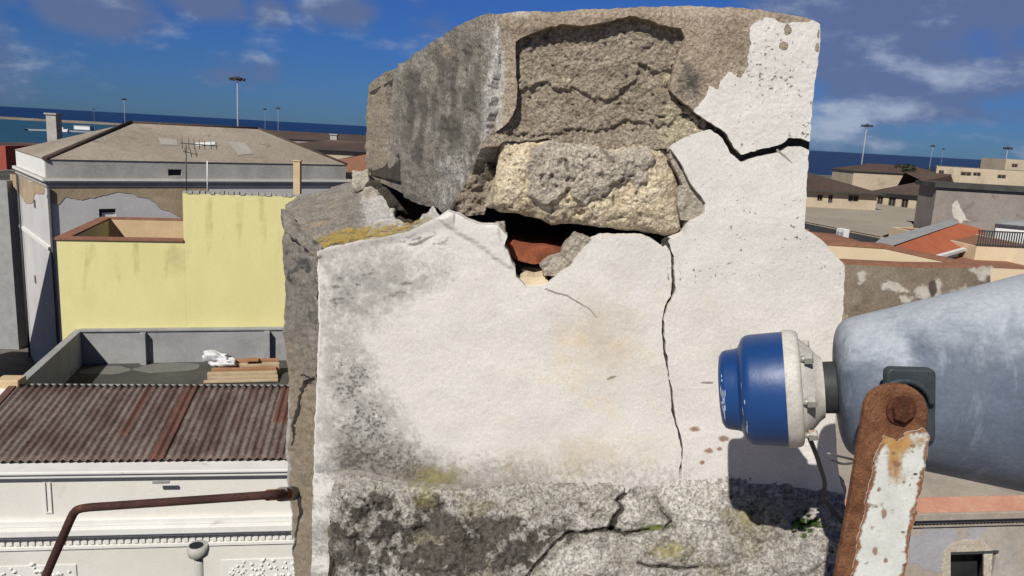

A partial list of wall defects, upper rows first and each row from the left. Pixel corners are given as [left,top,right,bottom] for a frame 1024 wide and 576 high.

spalling [428,6,820,285]
crack [663,84,807,163]
peeling [10,174,207,218]
flaking render [882,278,967,303]
flaking render [969,266,993,281]
crack [661,237,682,469]
corrosion [148,384,199,461]
corrosion [273,385,289,424]
water stain [337,362,426,480]
crack [527,488,672,576]
crack [638,561,699,569]
corrosion [851,428,930,576]